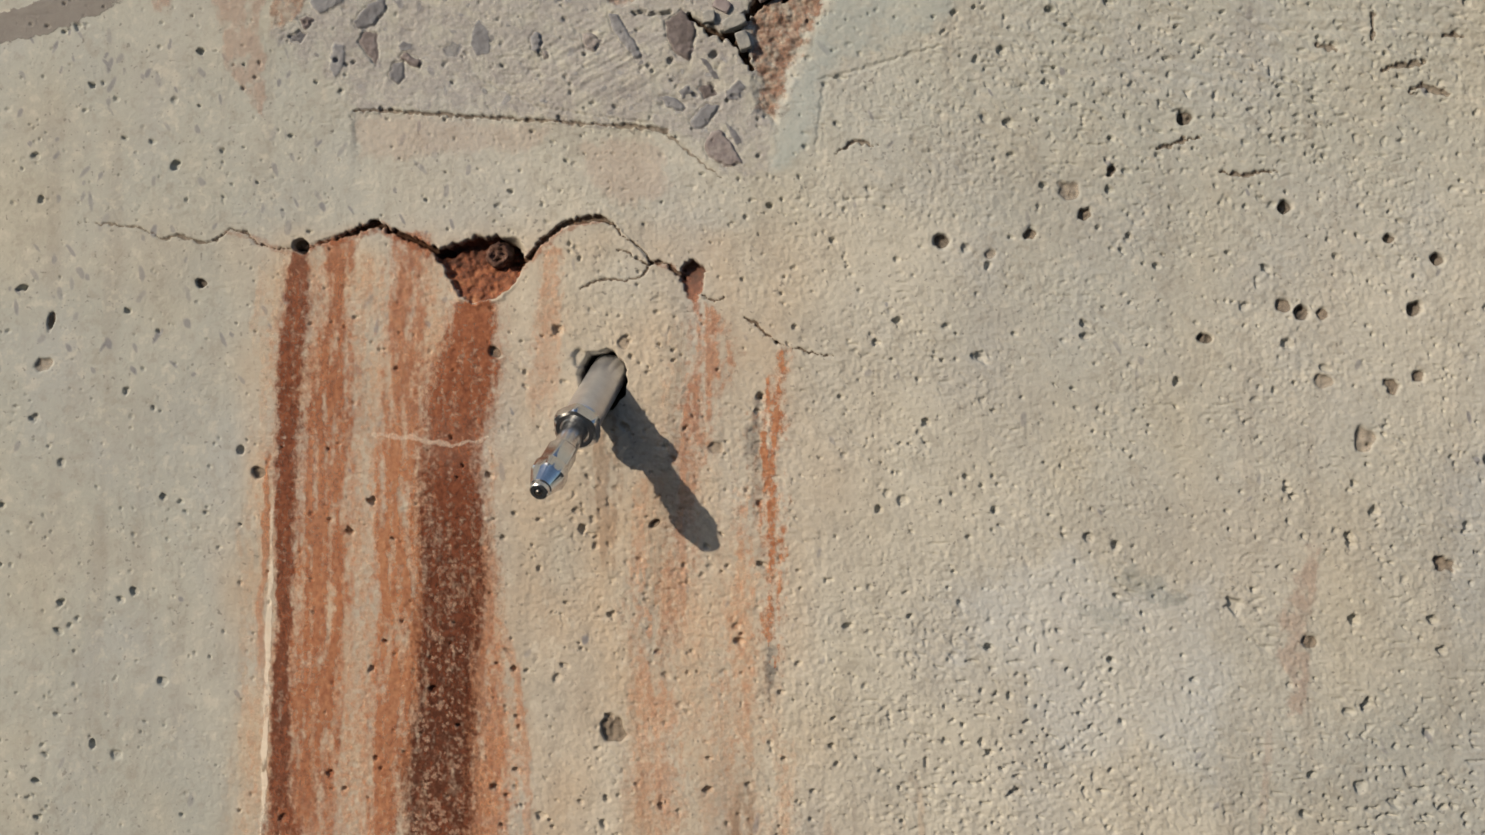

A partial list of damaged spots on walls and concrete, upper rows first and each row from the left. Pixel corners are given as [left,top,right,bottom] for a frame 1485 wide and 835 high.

spalling [271,0,428,84]
spalling [459,2,542,56]
spalling [575,0,648,59]
spalling [596,0,822,166]
crack [310,220,457,259]
spalling [438,237,526,304]
crack [521,215,828,357]
spalling [682,261,706,302]
corrosion [261,238,508,835]
corrosion [758,351,788,668]